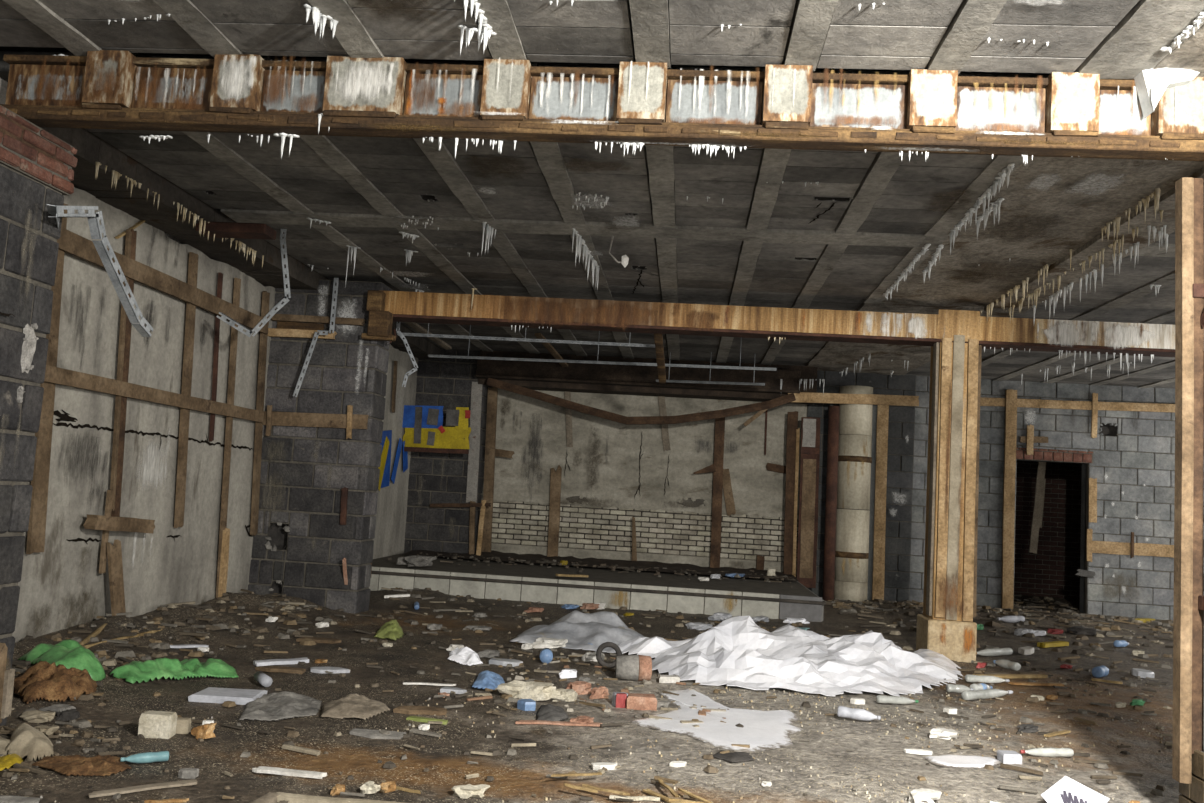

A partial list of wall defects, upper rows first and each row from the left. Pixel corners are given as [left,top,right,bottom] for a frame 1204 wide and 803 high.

corrosion [388,64,474,130]
corrosion [834,116,893,126]
spalling [17,323,39,403]
crack [53,410,252,450]
crack [66,536,101,544]